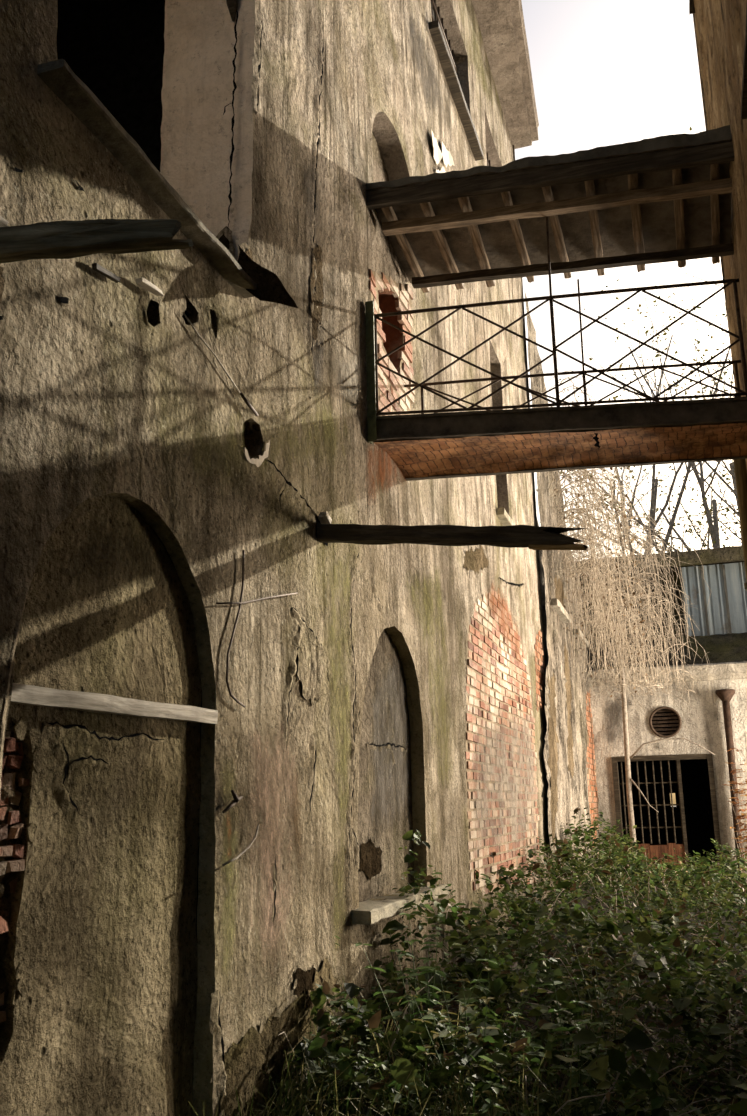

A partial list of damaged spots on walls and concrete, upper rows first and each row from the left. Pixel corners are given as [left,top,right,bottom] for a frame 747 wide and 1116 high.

crack [223,1,263,226]
spalling [143,292,164,333]
spalling [179,286,221,348]
spalling [369,269,415,416]
spalling [242,418,270,467]
spalling [0,585,42,1063]
crack [42,721,167,826]
crack [281,546,408,907]
spalling [358,833,383,884]
spalling [461,545,599,902]
spalling [210,945,339,1116]